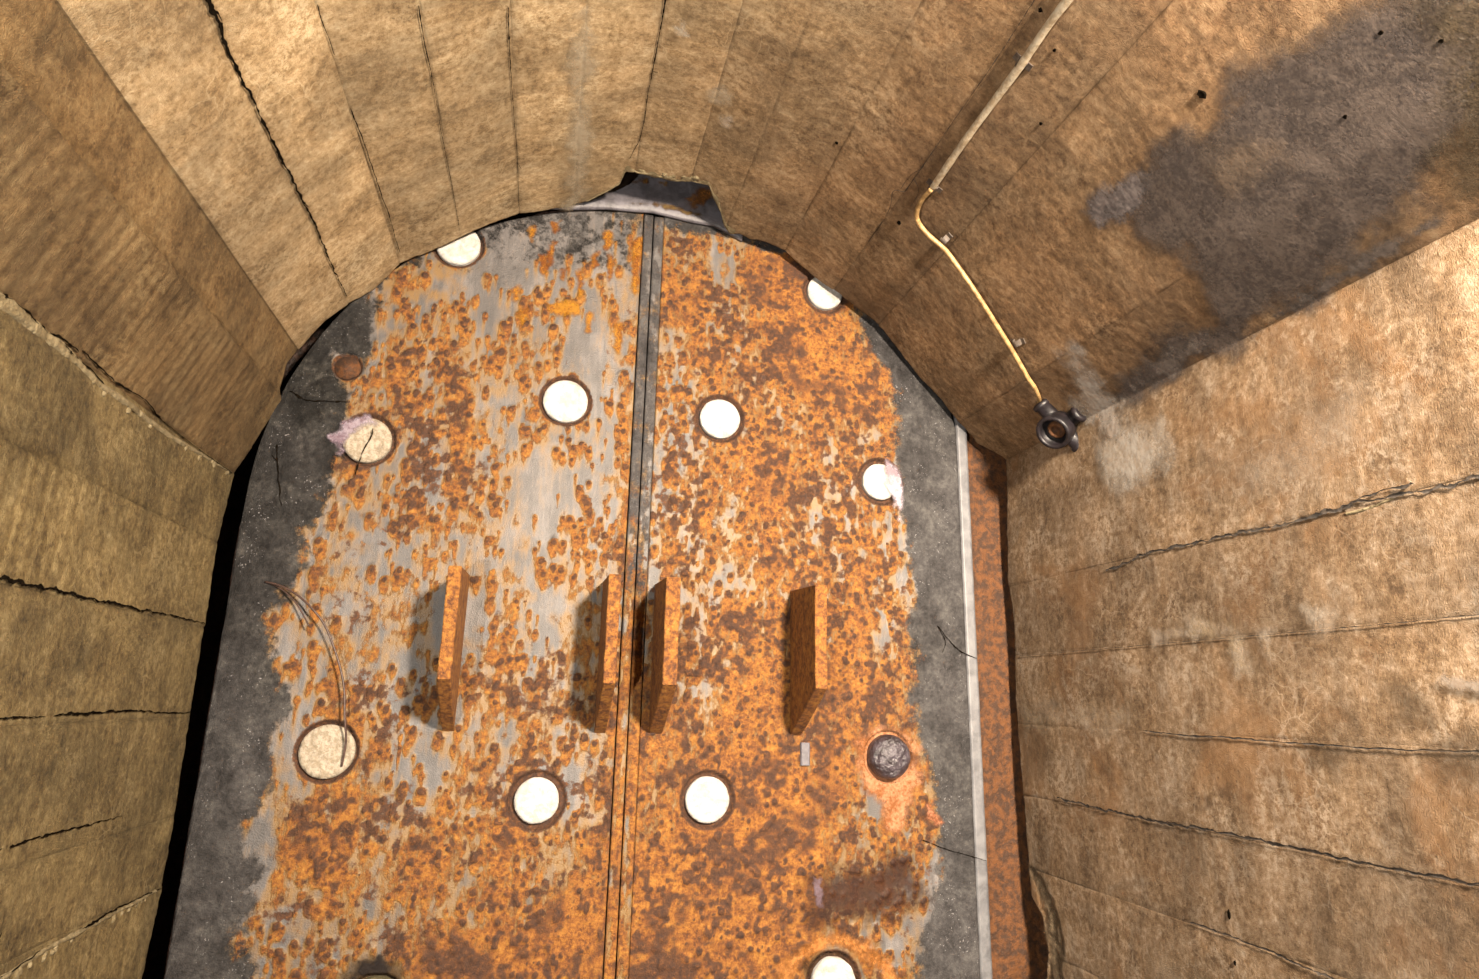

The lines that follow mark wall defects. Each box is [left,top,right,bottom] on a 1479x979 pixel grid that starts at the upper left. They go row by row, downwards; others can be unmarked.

crack [205,0,347,296]
crack [350,108,400,251]
corrosion [511,221,613,333]
corrosion [631,237,643,294]
damp [1069,0,1479,489]
corrosion [613,322,623,354]
crack [1105,474,1479,571]
corrosion [855,726,943,831]
crack [1057,797,1479,887]
corrosion [777,853,925,979]